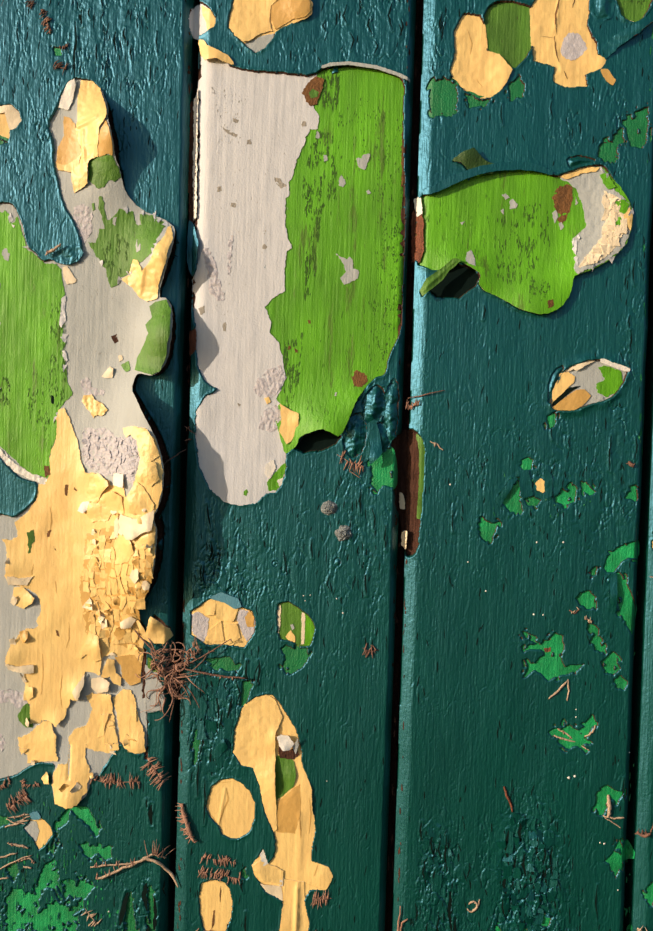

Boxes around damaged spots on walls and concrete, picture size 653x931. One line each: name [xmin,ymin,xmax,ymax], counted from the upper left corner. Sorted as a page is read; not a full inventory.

crack [10,166,54,223]
peeling [188,0,651,519]
crack [466,302,542,404]
peeling [0,78,175,931]
crack [425,450,488,596]
crack [510,388,640,619]
peeling [191,599,255,647]
crack [187,447,387,818]
peeling [277,602,315,674]
crack [97,765,166,931]
peeling [199,880,232,931]
peeling [206,657,333,931]